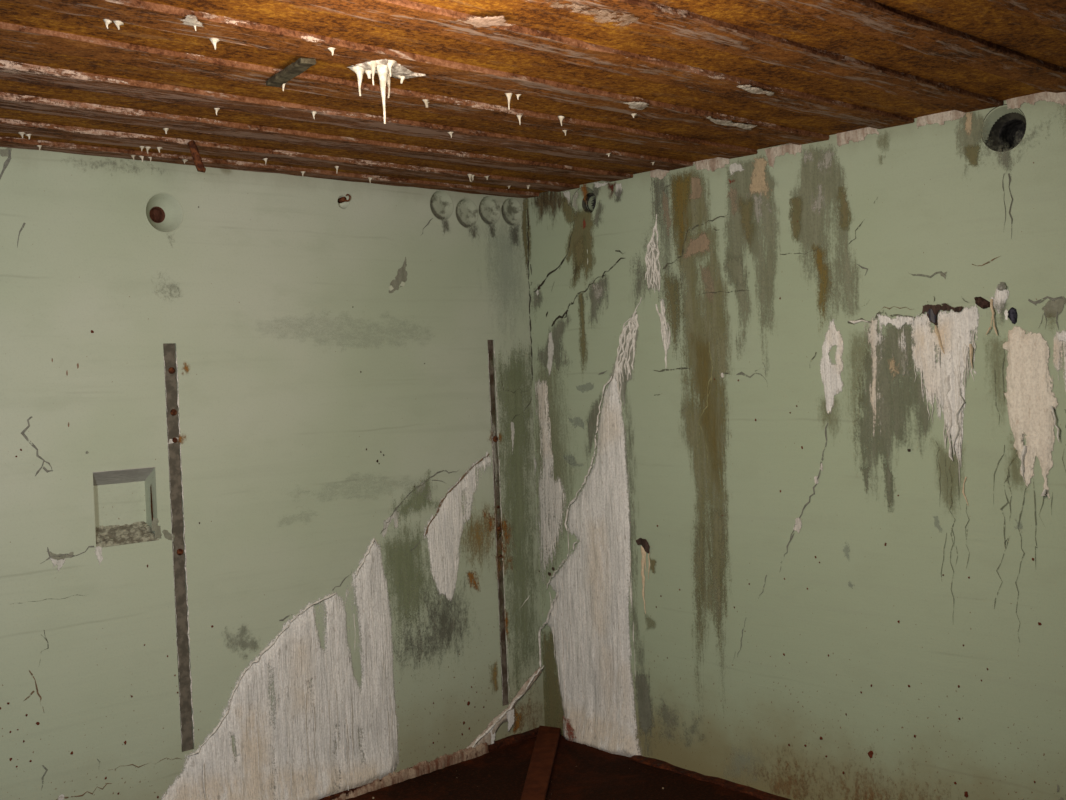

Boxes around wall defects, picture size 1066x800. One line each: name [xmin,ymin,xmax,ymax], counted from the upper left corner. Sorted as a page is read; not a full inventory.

leakage [0,60,130,85]
leakage [0,92,157,116]
leakage [0,118,304,171]
crack [500,208,625,451]
spalling [922,301,962,325]
flaking render [974,297,990,309]
leakage [161,127,879,800]
crack [733,423,828,660]
crack [42,758,179,800]